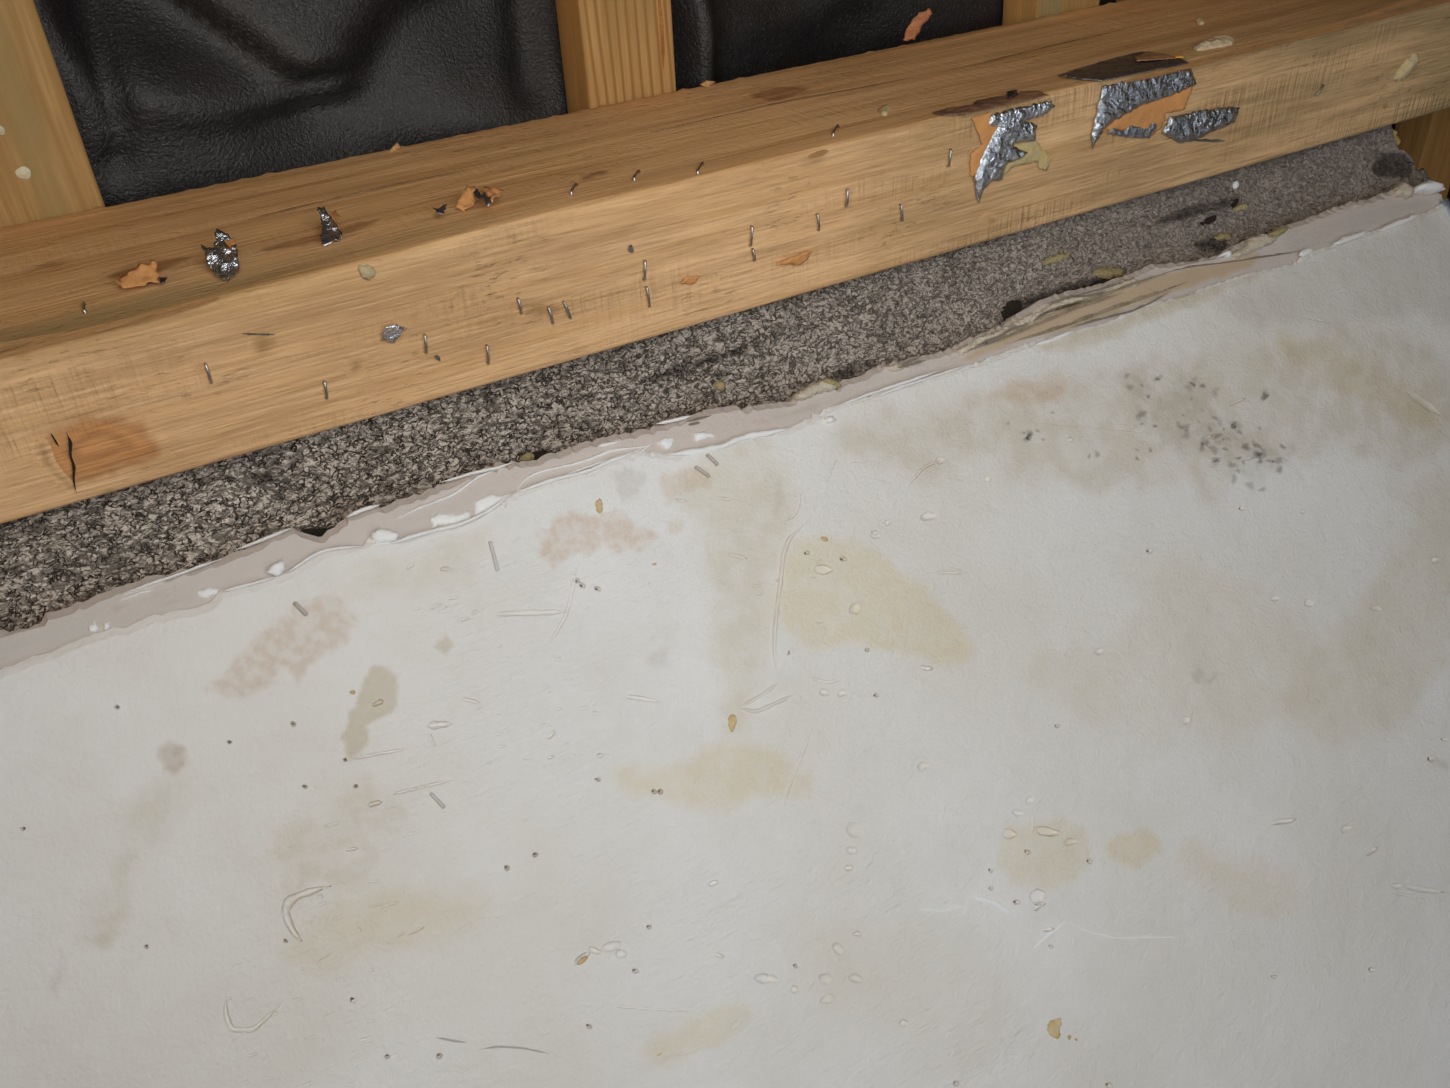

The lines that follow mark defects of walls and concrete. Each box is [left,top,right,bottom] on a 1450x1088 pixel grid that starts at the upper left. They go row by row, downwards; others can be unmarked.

peeling [1218,226,1289,259]
peeling [1333,180,1446,245]
peeling [974,277,1140,343]
peeling [792,359,942,424]
peeling [196,416,791,599]
damp [594,199,1450,824]
peeling [121,559,221,600]
peeling [199,590,363,709]
damp [245,662,524,998]
damp [1099,820,1316,935]
damp [631,875,1047,1088]